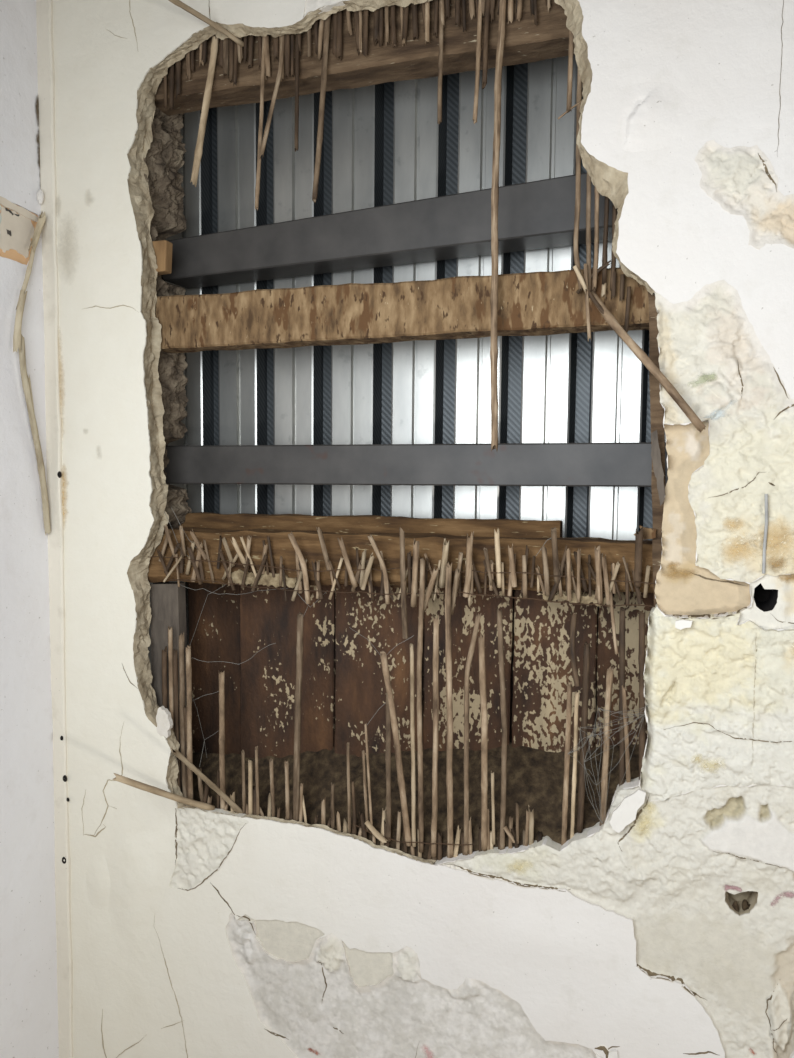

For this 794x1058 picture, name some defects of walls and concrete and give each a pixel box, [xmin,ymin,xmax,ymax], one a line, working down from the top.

peeling [0,196,39,265]
flaking render [169,0,794,1058]
crack [82,723,124,837]
crack [101,917,189,1058]